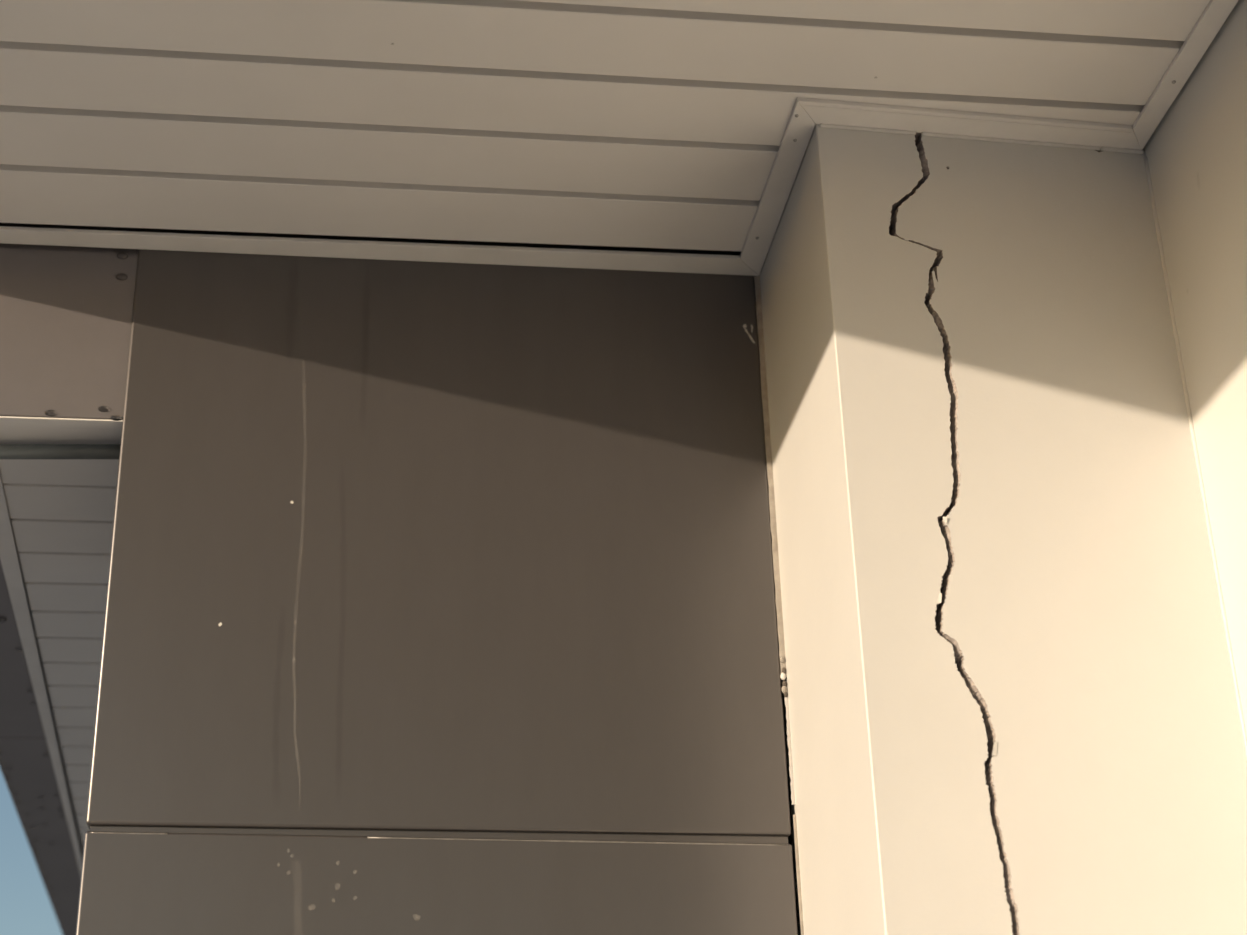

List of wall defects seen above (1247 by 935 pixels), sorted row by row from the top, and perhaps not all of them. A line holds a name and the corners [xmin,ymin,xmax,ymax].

crack [889,133,1020,935]